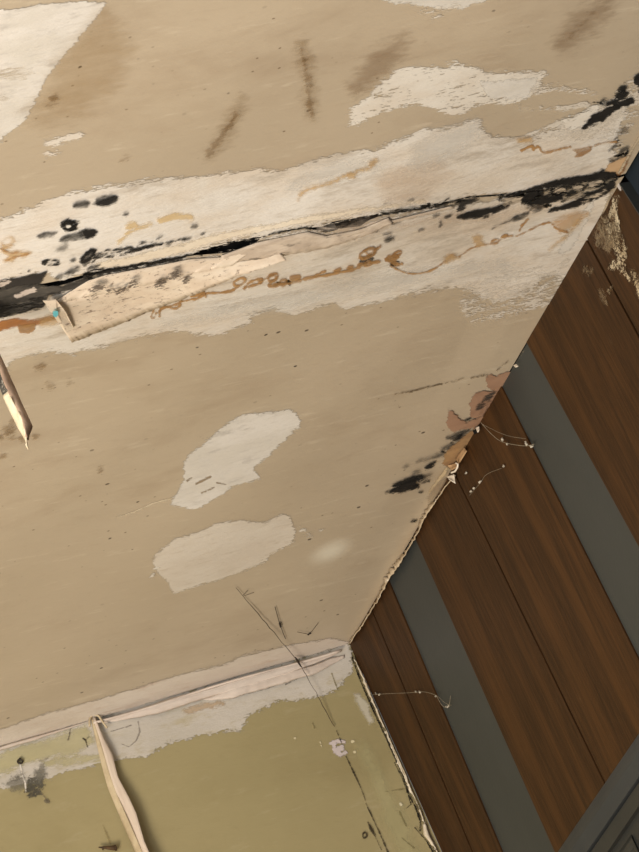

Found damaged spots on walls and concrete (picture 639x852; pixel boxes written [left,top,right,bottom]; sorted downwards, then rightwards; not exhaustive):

mould [581,73,639,130]
peeling [601,152,629,175]
crack [86,193,520,277]
peeling [441,364,518,484]
crack [337,733,389,852]